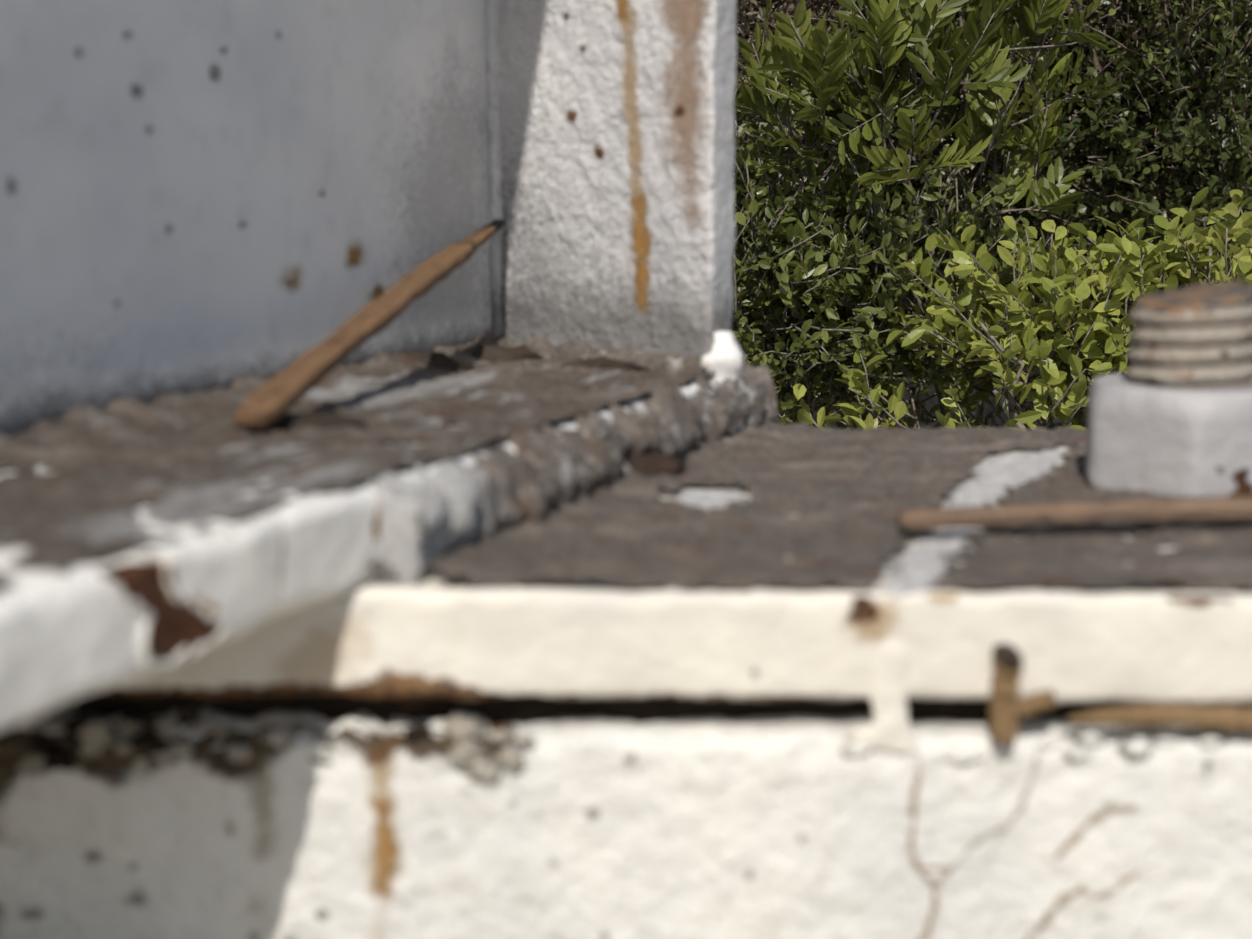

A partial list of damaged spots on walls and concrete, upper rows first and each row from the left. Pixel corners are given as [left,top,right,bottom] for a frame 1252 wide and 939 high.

corrosion [617,0,650,308]
spalling [0,708,534,800]
corrosion [363,729,404,895]
crack [908,759,951,939]
crack [1035,873,1138,932]
crack [1056,804,1135,858]